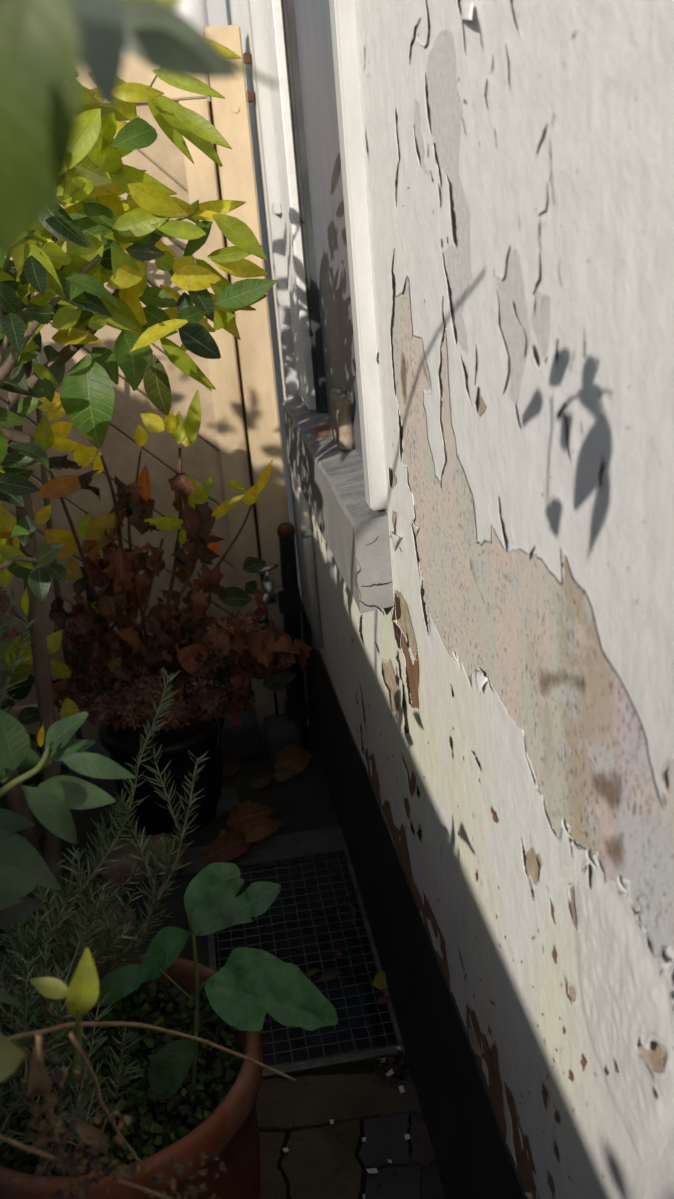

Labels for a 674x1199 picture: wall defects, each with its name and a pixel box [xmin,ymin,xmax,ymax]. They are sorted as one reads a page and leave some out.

crack [409,0,429,64]
crack [457,0,520,142]
crack [365,110,441,207]
crack [452,324,477,406]
crack [512,114,603,488]
peeling [375,29,674,1019]
peeling [355,682,476,992]
peeling [466,996,559,1199]
peeling [636,1030,672,1101]